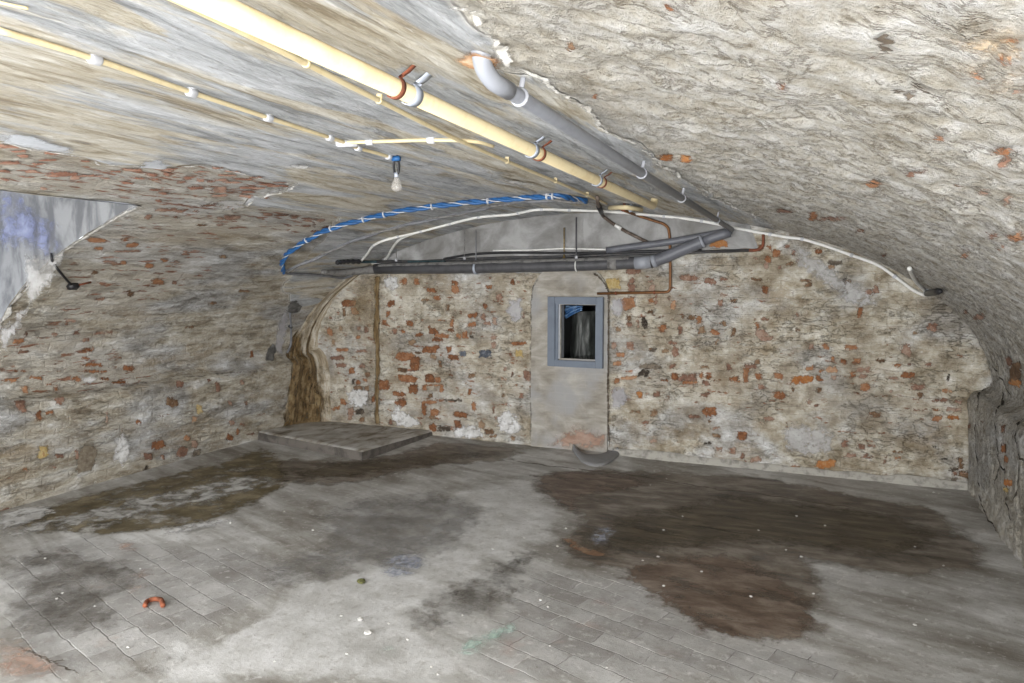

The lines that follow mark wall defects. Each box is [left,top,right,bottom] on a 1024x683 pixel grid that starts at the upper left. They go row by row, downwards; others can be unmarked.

flaking render [490,36,769,224]
water stain [1,426,521,535]
water stain [534,470,982,640]
crack [974,355,1024,533]